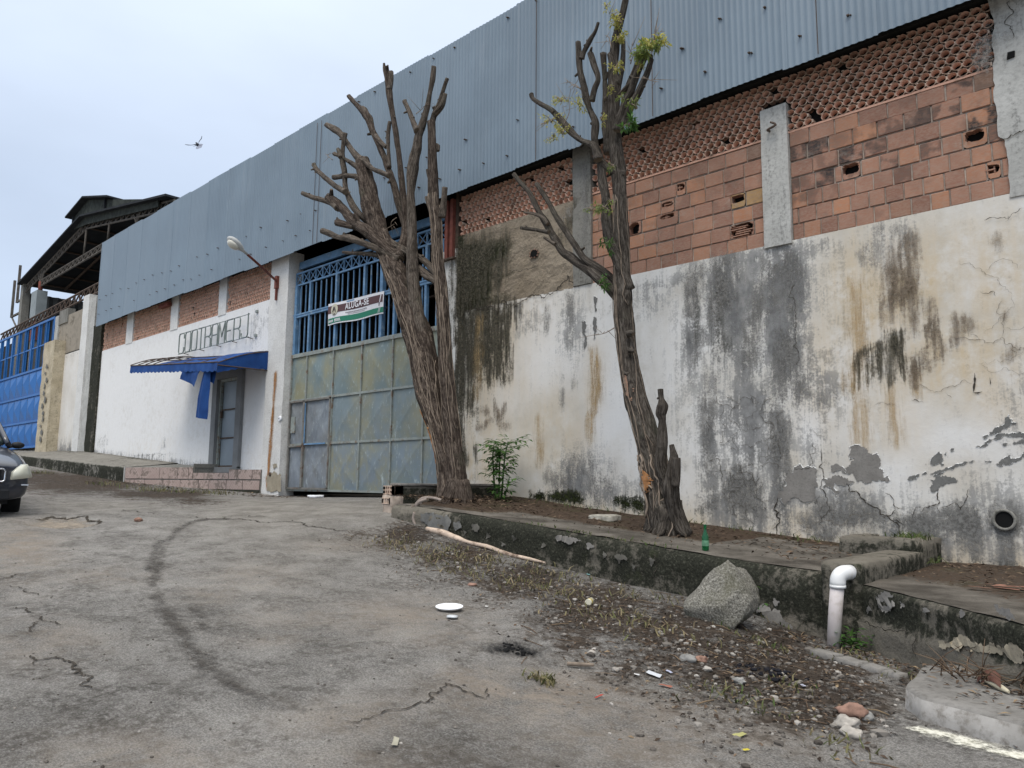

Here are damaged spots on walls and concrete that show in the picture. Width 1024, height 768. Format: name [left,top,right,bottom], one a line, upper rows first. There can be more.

damp [448,228,522,465]
damp [854,227,974,388]
crack [880,259,1024,405]
corrosion [265,372,277,488]
peeling [777,444,890,506]
crack [708,388,968,534]
peeling [907,415,1024,493]
crack [0,573,94,688]
crack [346,682,489,722]
peeling [866,591,905,614]
peeling [937,634,1024,664]